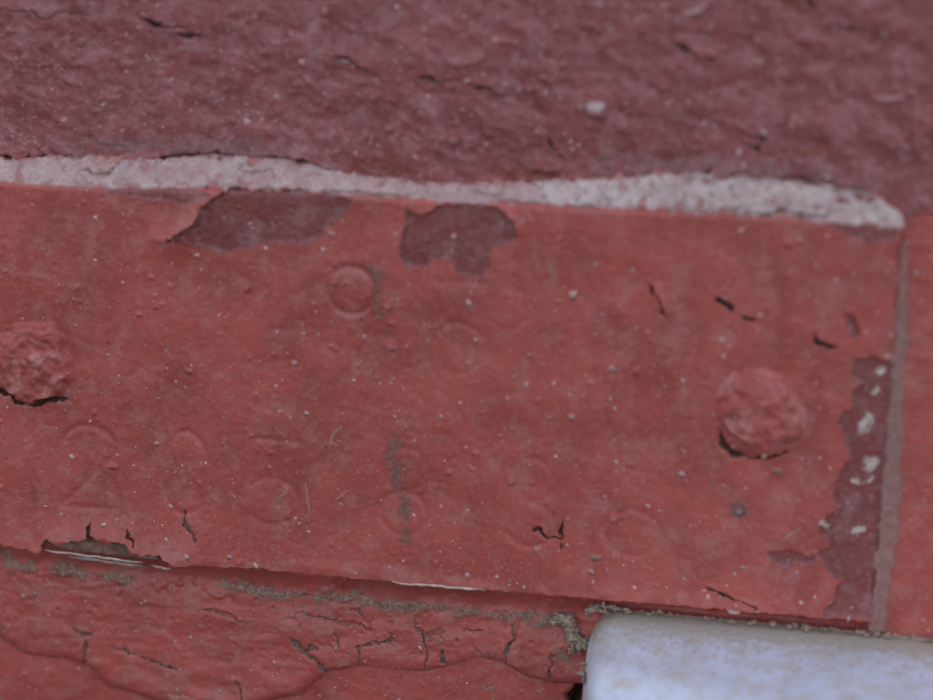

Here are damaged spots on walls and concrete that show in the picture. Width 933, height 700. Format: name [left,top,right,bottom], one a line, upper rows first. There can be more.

crack [143,18,207,39]
crack [677,43,715,63]
crack [417,76,441,84]
crack [466,83,507,97]
peeling [103,187,351,254]
peeling [399,202,516,278]
peeling [824,222,899,243]
peeling [766,356,893,621]
crack [198,608,245,623]
crack [288,609,482,672]
crack [503,620,520,664]